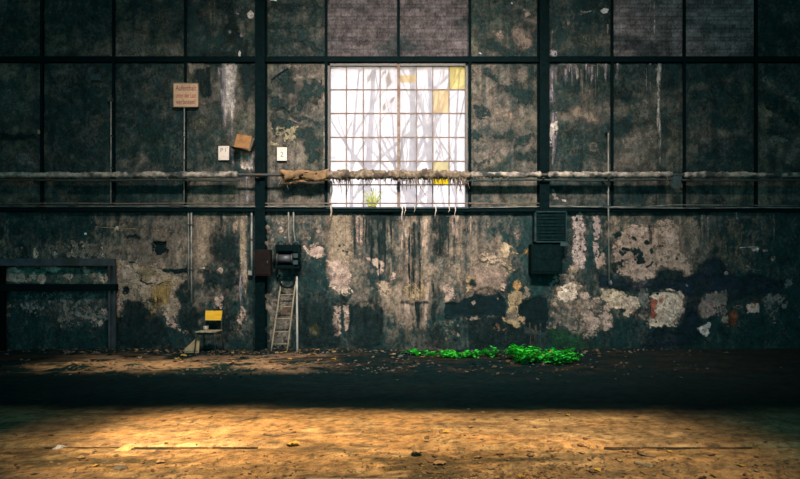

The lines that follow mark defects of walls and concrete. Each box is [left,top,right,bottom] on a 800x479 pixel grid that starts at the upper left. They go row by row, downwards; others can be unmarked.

leakage [169,40,255,141]
leakage [549,112,558,164]
leakage [550,63,607,124]
leakage [614,63,661,169]
peeling [303,213,396,337]
leakage [353,212,541,350]
spalling [441,212,701,340]
peeling [697,278,793,337]